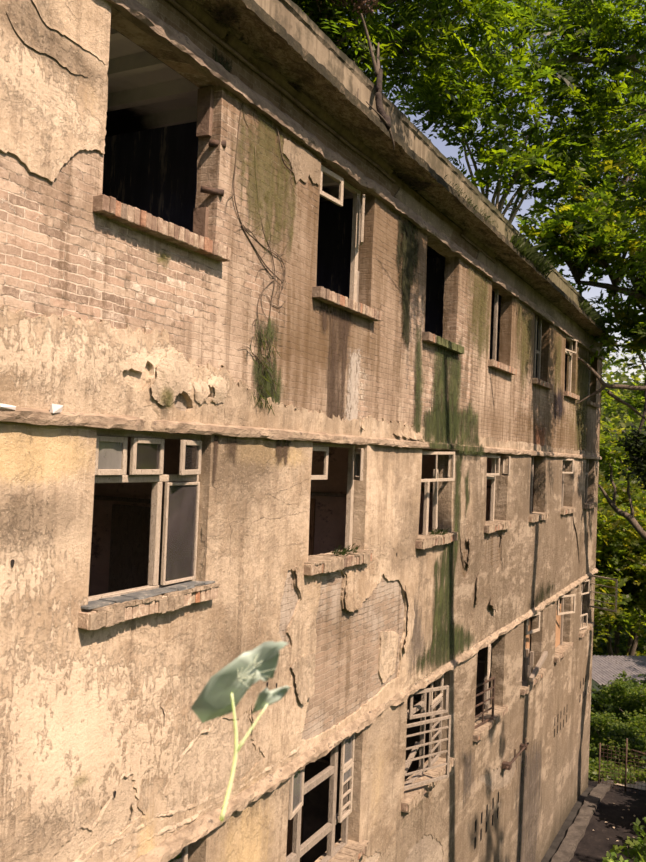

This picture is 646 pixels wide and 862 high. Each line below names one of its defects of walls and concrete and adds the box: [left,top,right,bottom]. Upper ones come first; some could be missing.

crack [6,0,106,77]
flaking render [0,149,240,367]
flaking render [122,360,154,392]
flaking render [174,392,193,412]
water stain [321,303,361,421]
water stain [410,602,424,670]
flaking render [51,566,415,862]